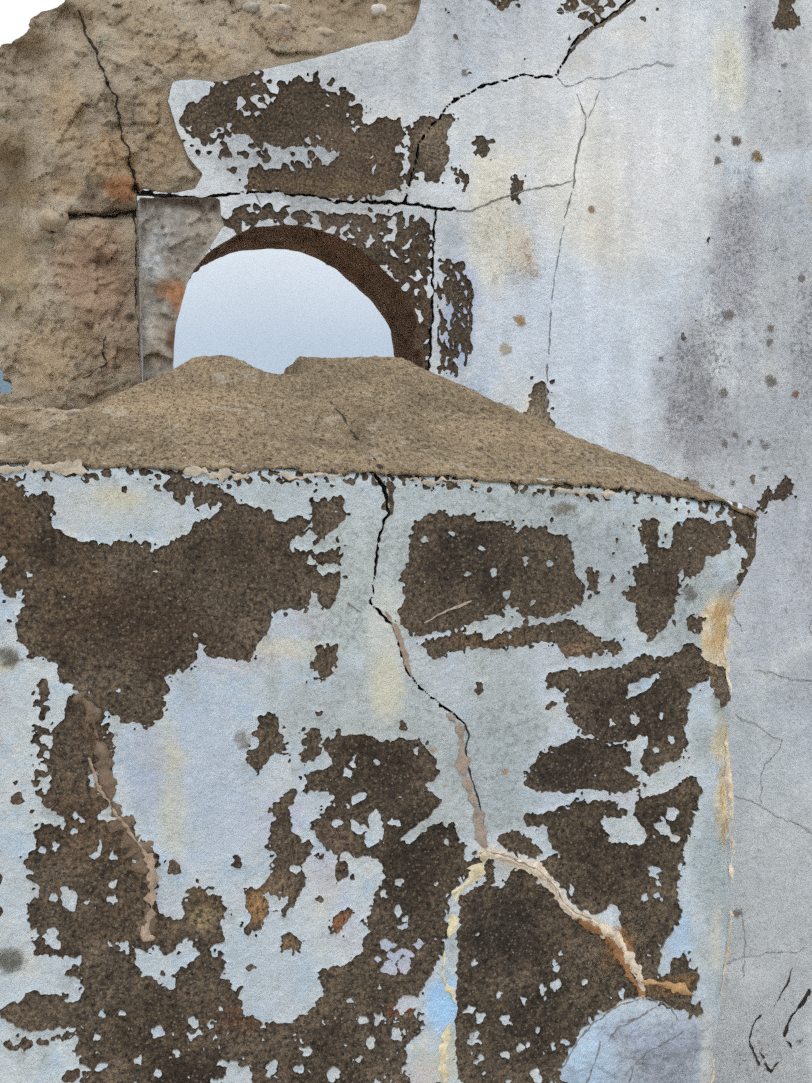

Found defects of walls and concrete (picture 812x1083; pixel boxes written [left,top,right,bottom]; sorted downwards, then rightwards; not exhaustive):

peeling [488,0,520,11]
peeling [557,0,626,27]
peeling [772,0,803,31]
peeling [471,136,495,160]
spalling [0,0,474,451]
crack [69,0,674,417]
peeling [510,174,526,205]
peeling [523,376,555,427]
crack [330,401,694,1083]
peeling [0,459,796,1083]